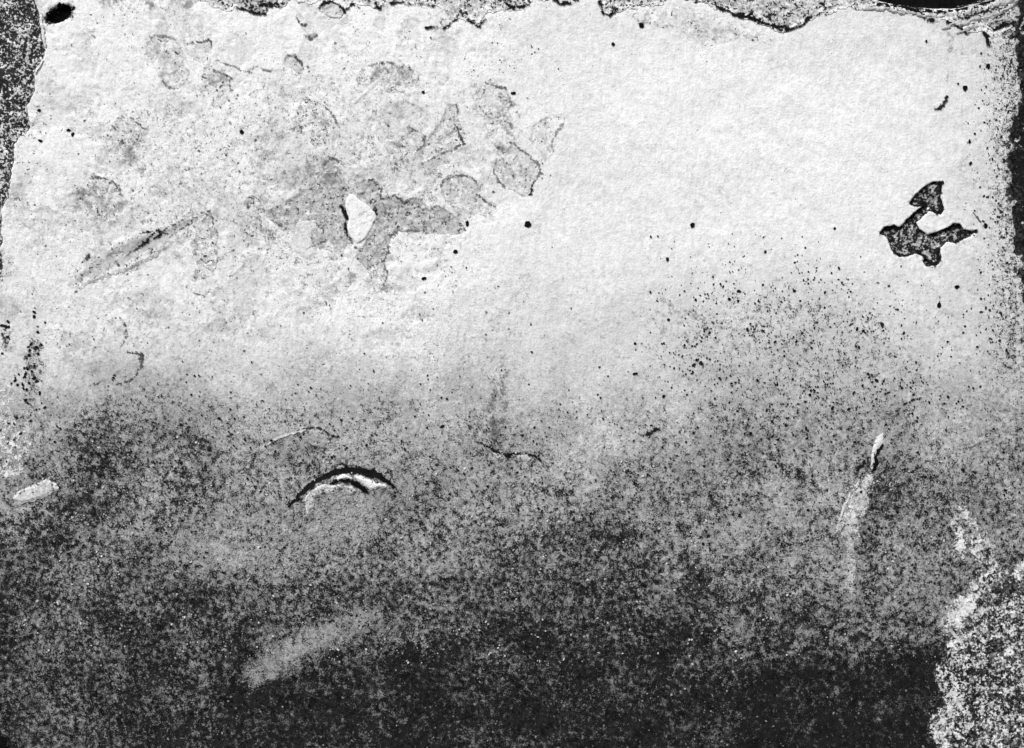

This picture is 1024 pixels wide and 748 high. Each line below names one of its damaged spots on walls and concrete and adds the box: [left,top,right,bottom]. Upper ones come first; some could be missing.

spalling [0,0,46,282]
spalling [184,0,579,30]
spalling [597,0,1024,360]
water stain [962,6,1019,391]
crack [266,426,405,513]
water stain [0,243,1024,748]